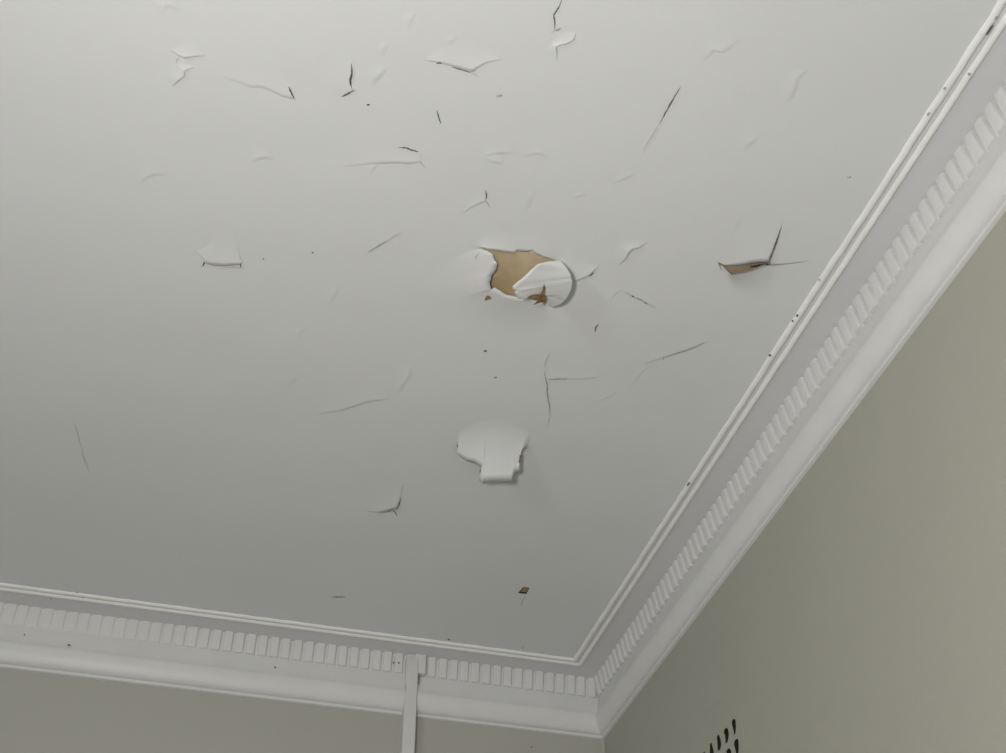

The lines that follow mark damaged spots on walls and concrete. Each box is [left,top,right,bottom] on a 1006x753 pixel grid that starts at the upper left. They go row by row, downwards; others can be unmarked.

crack [223,61,357,100]
crack [636,88,680,153]
crack [342,141,424,178]
crack [644,331,709,364]